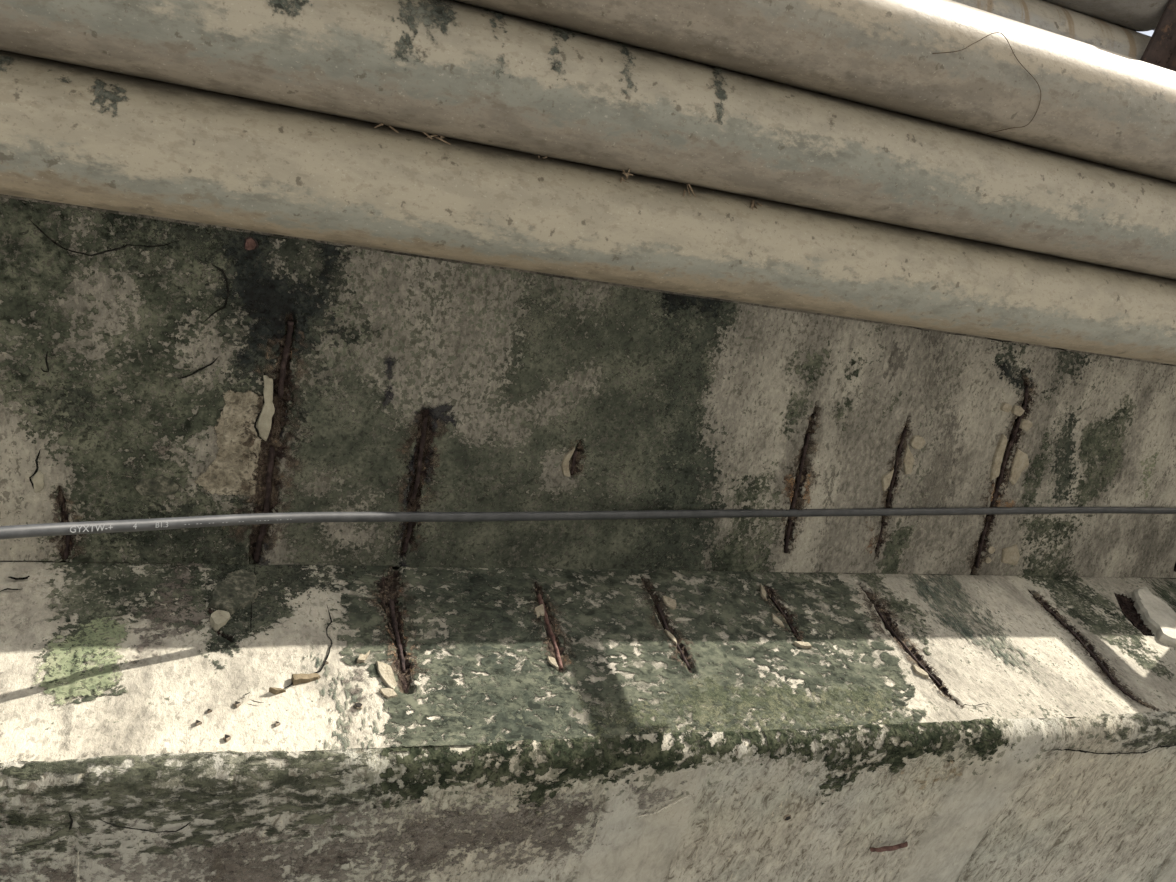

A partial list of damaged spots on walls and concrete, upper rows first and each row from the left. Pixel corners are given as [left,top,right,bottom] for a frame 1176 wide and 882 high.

crack [29,219,177,256]
water stain [661,293,724,323]
water stain [214,229,357,445]
water stain [382,357,398,408]
water stain [997,359,1033,397]
water stain [394,404,456,567]
peeling [1114,587,1176,647]
peeling [269,660,329,695]
crack [1046,745,1176,755]